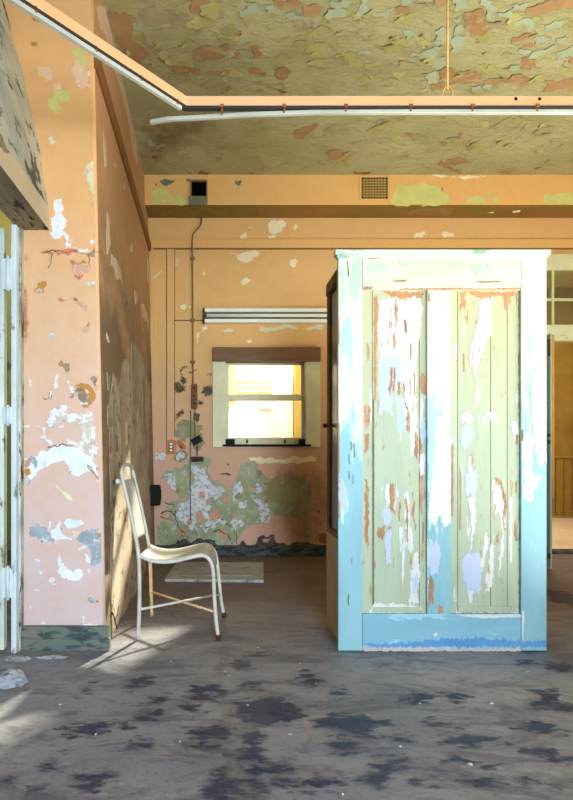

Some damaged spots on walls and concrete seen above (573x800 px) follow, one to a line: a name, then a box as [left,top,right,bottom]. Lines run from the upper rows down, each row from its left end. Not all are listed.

peeling [95,0,573,96]
peeling [391,133,486,217]
peeling [29,198,96,288]
peeling [231,250,259,262]
peeling [24,344,326,637]
damp [38,763,117,793]
damp [54,693,171,750]
damp [177,680,415,800]
damp [398,691,474,704]
damp [421,716,554,789]
damp [511,720,570,737]
damp [523,686,573,713]